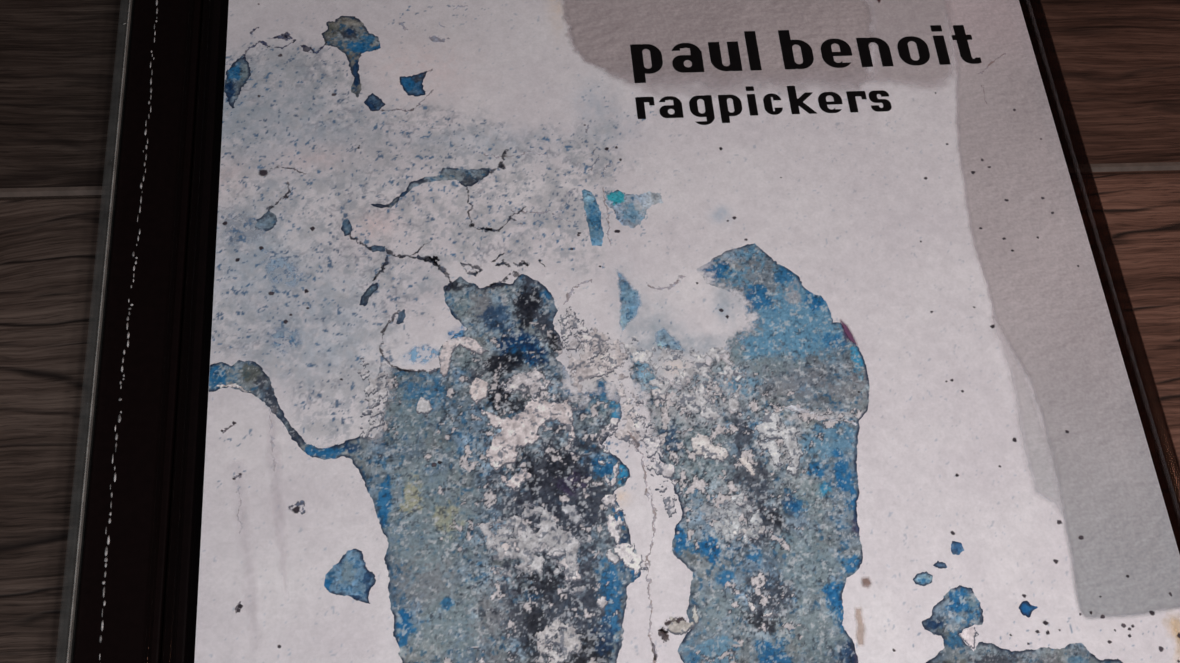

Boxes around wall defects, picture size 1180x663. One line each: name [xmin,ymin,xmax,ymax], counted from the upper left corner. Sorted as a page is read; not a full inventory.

peeling [322,16,386,111]
peeling [400,71,427,97]
crack [350,149,571,291]
crack [565,279,592,302]
crack [648,275,685,290]
peeling [209,243,870,663]
crack [628,432,685,663]
peeling [913,541,964,586]
peeling [922,585,1123,663]